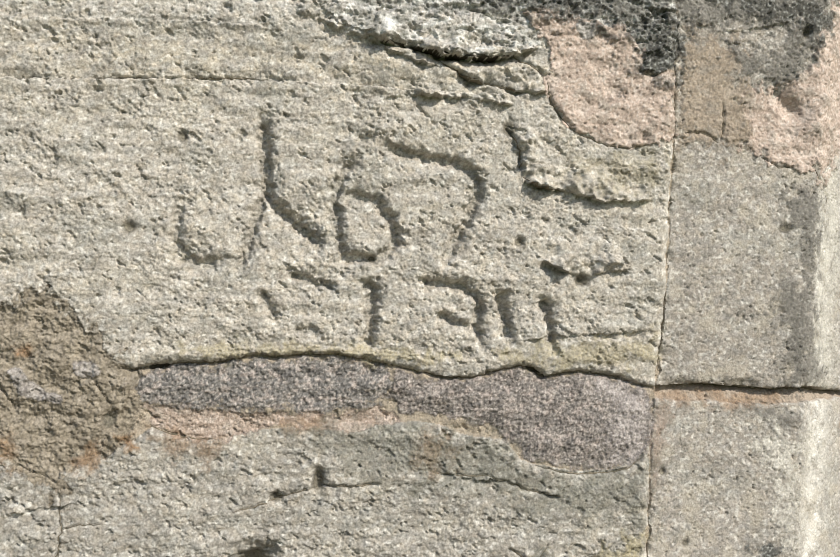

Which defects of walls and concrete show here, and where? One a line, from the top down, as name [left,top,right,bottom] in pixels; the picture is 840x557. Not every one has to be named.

peeling [523,0,840,190]
spalling [0,284,657,508]
crack [21,465,98,557]